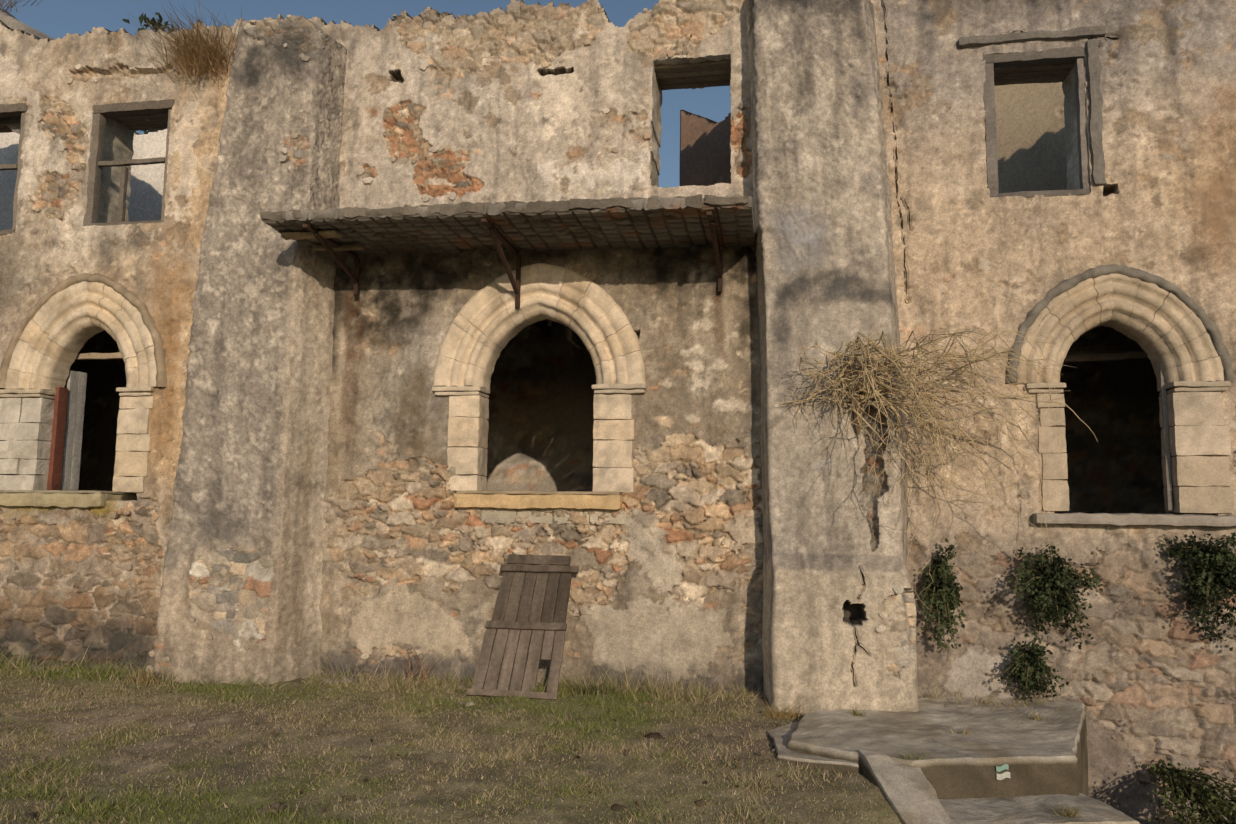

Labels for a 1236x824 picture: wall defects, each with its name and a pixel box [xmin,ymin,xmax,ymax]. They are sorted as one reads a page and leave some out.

peeling [0,52,203,244]
spalling [383,99,484,202]
spalling [393,0,652,193]
crack [881,0,912,304]
spalling [104,504,163,571]
spalling [188,546,275,651]
peeling [580,504,734,686]
peeling [717,509,763,554]
crack [850,401,890,686]
peeling [943,642,1020,698]